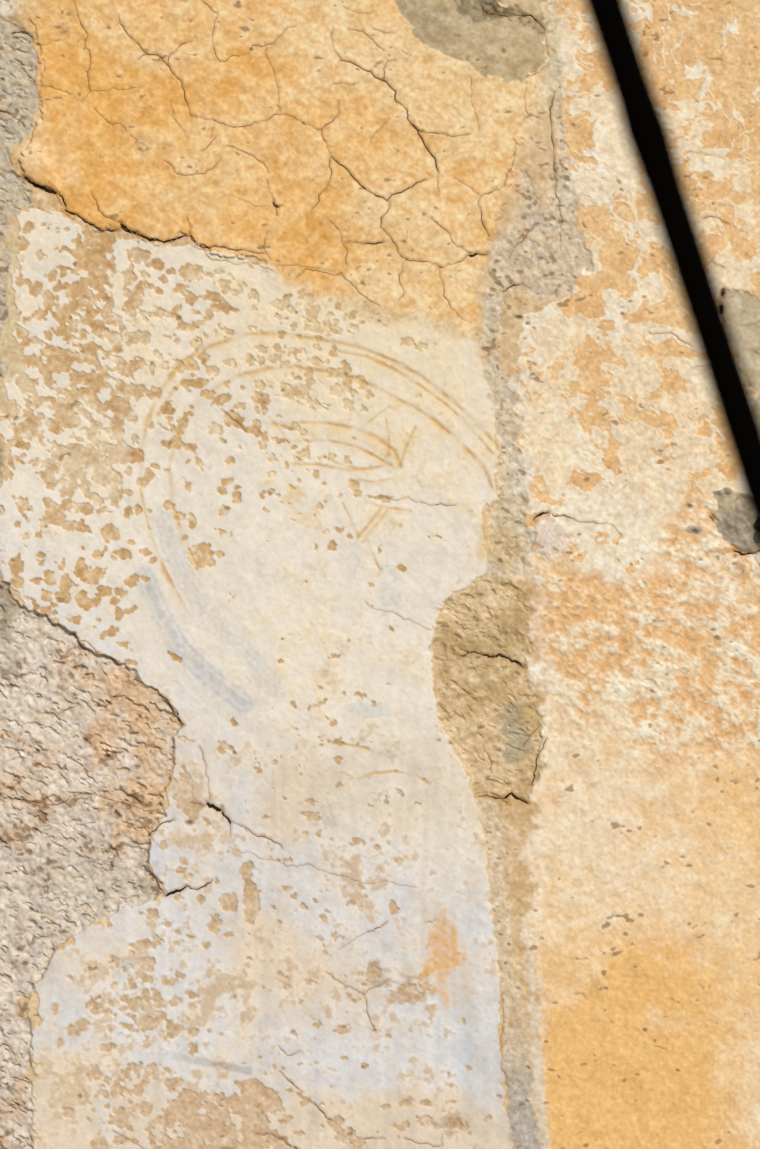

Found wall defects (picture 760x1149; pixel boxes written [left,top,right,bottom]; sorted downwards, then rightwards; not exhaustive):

peeling [556,0,612,173]
crack [1,0,533,321]
crack [485,11,563,249]
peeling [625,0,760,301]
peeling [400,338,428,352]
flaking render [0,15,394,1149]
peeling [538,532,640,577]
peeling [708,544,760,599]
peeling [367,789,422,808]
peeling [389,901,400,915]
peeling [380,1072,457,1140]